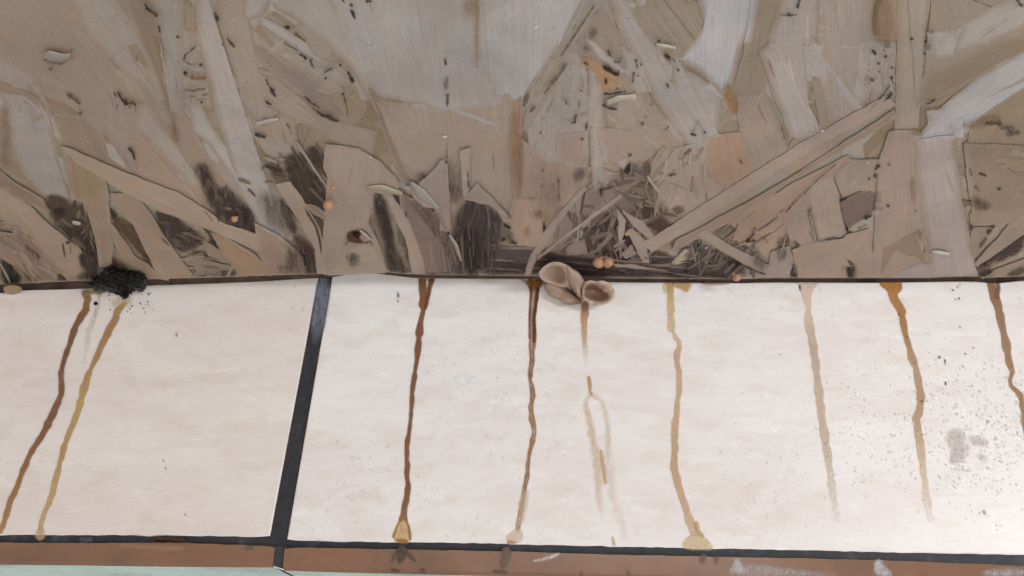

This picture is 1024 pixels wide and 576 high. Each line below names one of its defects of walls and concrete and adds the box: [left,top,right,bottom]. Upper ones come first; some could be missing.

leakage [0,196,153,539]